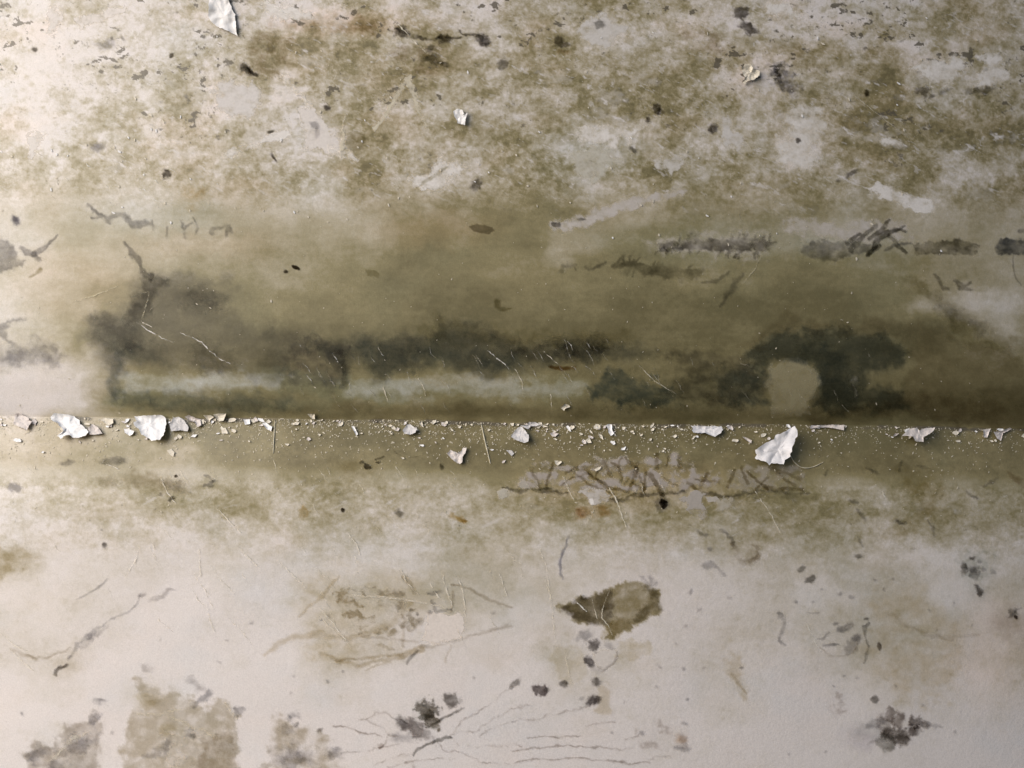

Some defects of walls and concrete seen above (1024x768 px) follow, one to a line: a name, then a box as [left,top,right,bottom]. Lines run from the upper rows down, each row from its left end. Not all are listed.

peeling [208,0,237,35]
damp [735,7,756,33]
peeling [0,413,272,456]
peeling [291,414,343,441]
peeling [374,420,472,464]
peeling [739,424,804,488]
peeling [810,424,847,443]
peeling [885,426,935,445]
peeling [975,428,1024,442]
damp [417,695,455,731]